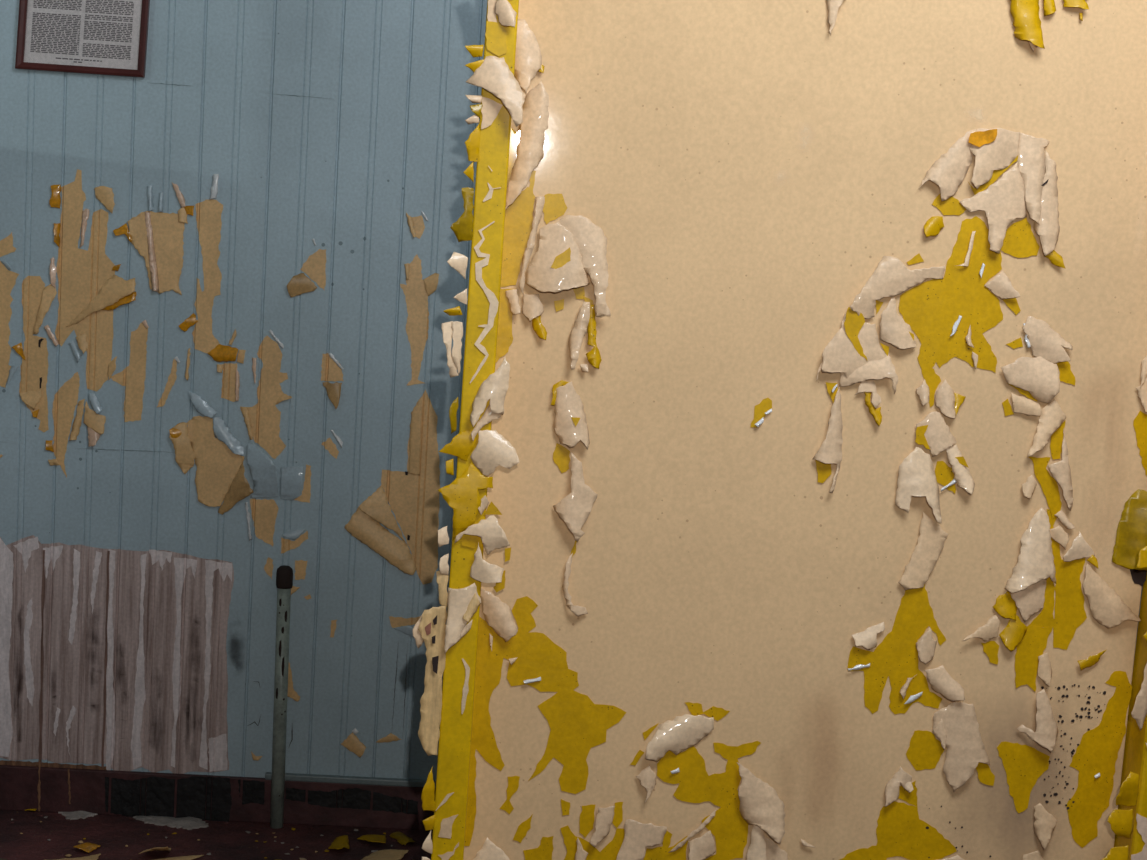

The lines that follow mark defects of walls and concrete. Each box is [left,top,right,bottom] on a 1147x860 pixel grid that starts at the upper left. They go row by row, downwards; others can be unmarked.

peeling [1010,0,1089,51]
peeling [287,239,326,297]
peeling [0,169,312,600]
peeling [321,352,344,409]
peeling [321,430,343,459]
peeling [341,0,788,860]
peeling [813,128,1147,860]